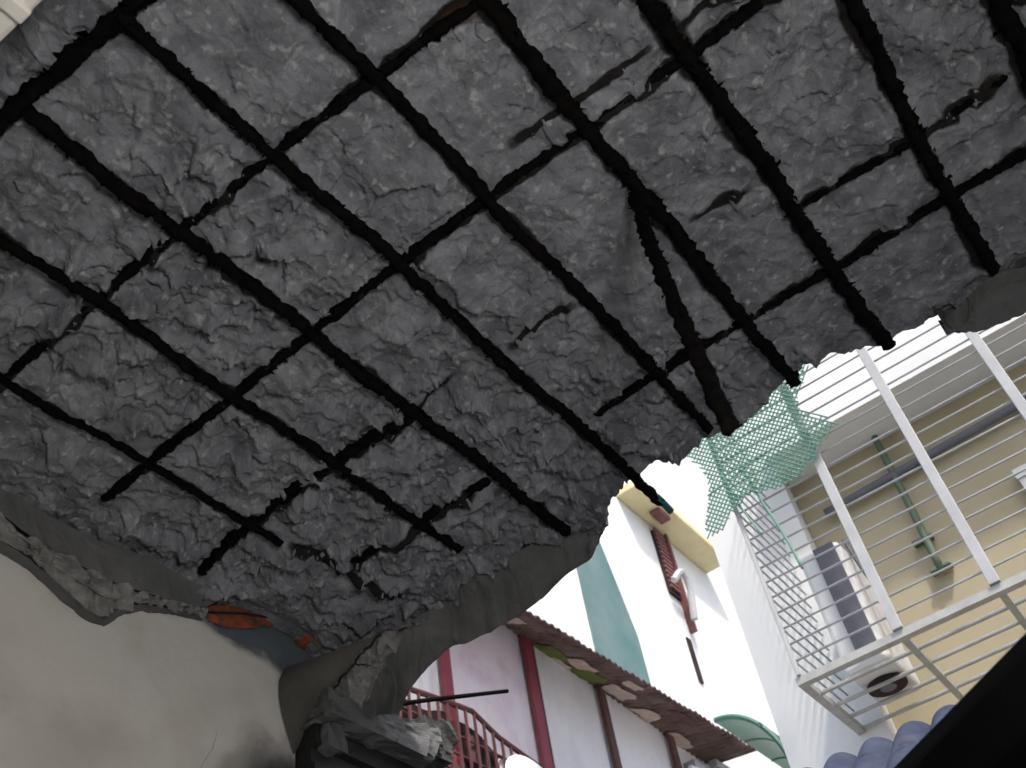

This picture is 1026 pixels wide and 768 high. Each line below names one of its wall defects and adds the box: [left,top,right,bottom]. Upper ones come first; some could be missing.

spalling [0,0,720,754]
spalling [126,0,1026,437]